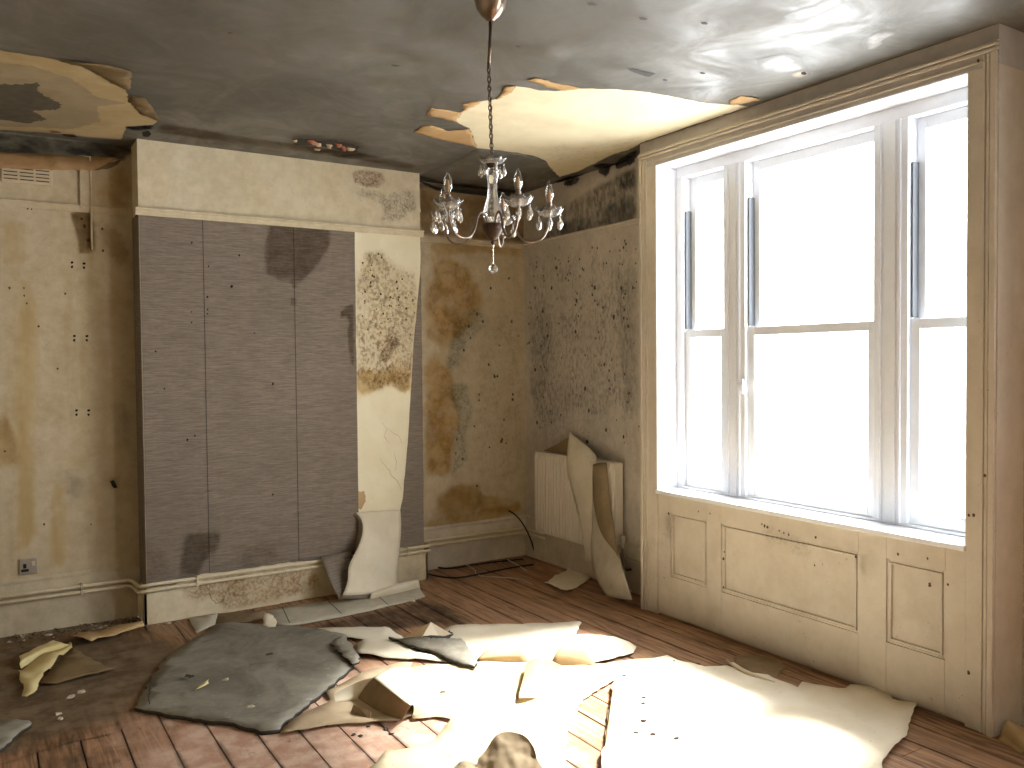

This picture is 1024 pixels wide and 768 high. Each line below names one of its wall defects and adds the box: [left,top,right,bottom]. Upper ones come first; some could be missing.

peeling [0,50,161,139]
flaking render [292,138,359,152]
peeling [414,78,760,177]
water stain [349,151,640,485]